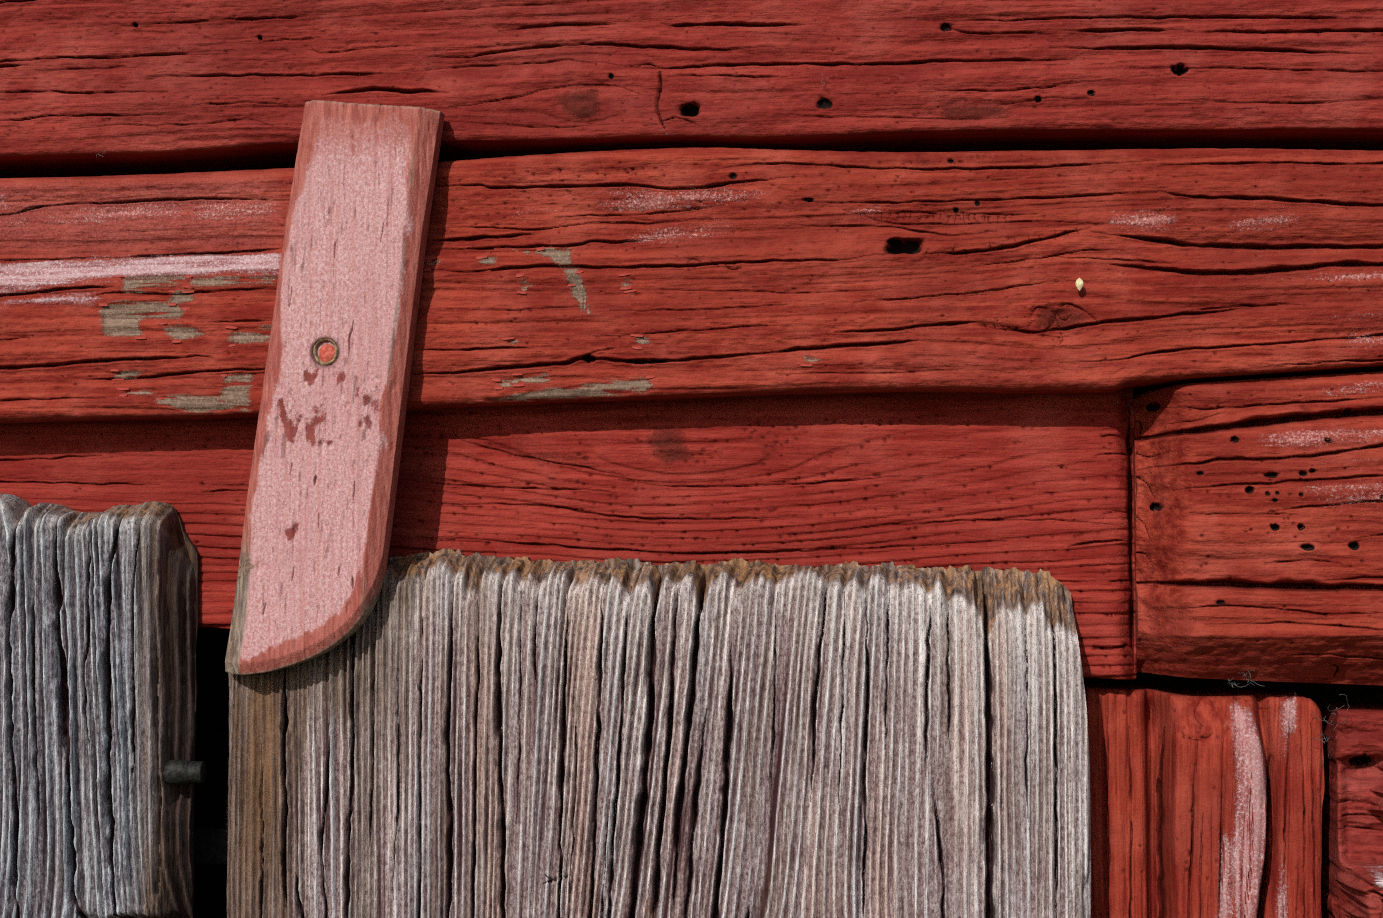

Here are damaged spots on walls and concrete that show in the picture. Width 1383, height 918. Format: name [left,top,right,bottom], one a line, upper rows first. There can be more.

crack [0,456,149,918]
crack [261,412,1134,918]
crack [1106,721,1315,918]